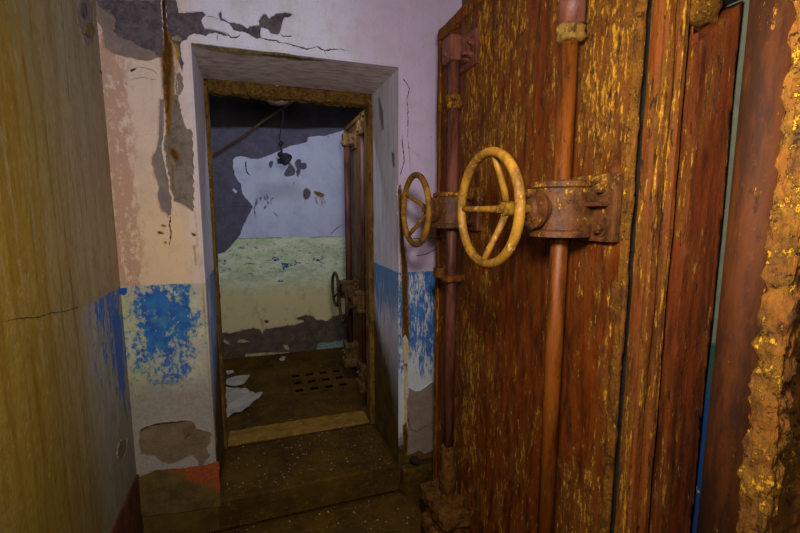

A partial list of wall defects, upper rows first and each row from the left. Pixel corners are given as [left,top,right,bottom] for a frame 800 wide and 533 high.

corrosion [161,0,178,133]
crack [261,38,346,54]
spalling [76,0,293,245]
peeling [209,94,364,254]
crack [2,307,79,322]
spalling [222,313,347,359]
spalling [139,419,212,466]